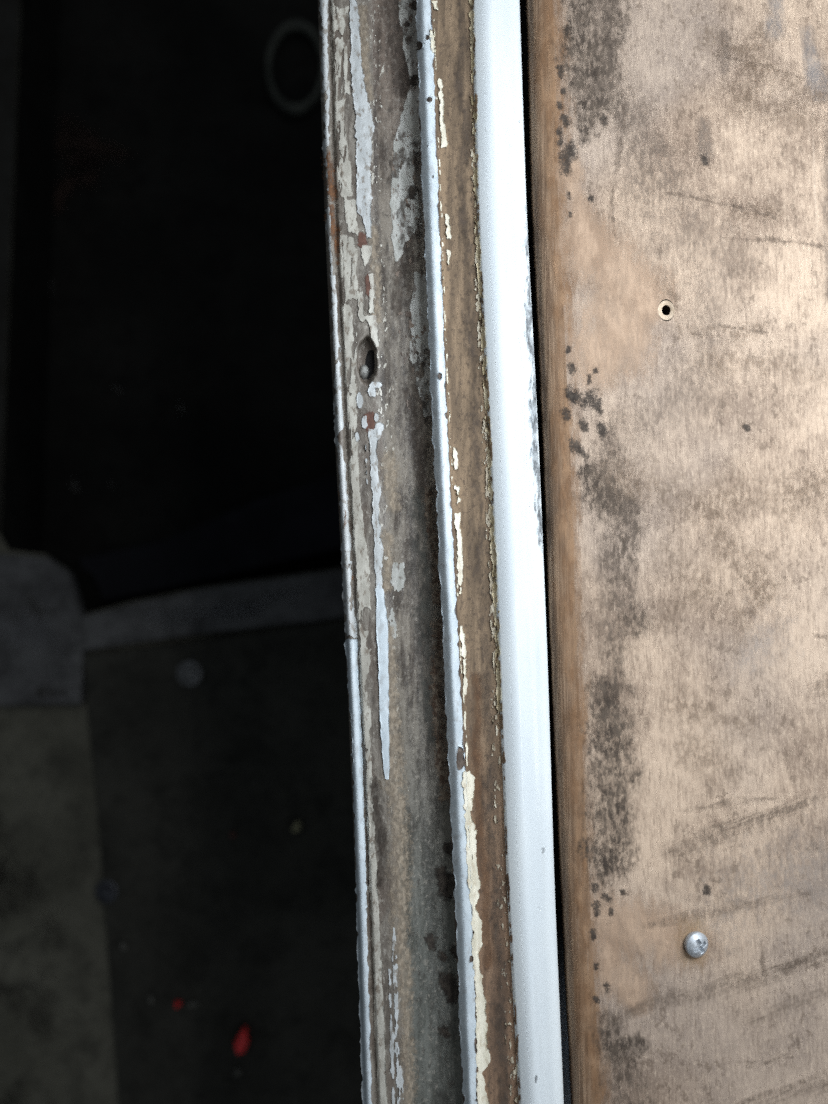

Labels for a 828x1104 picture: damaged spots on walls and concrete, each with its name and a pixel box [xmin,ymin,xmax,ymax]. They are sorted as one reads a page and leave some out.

peeling [319,0,491,1104]
peeling [469,0,521,1103]
damp [539,0,648,1104]